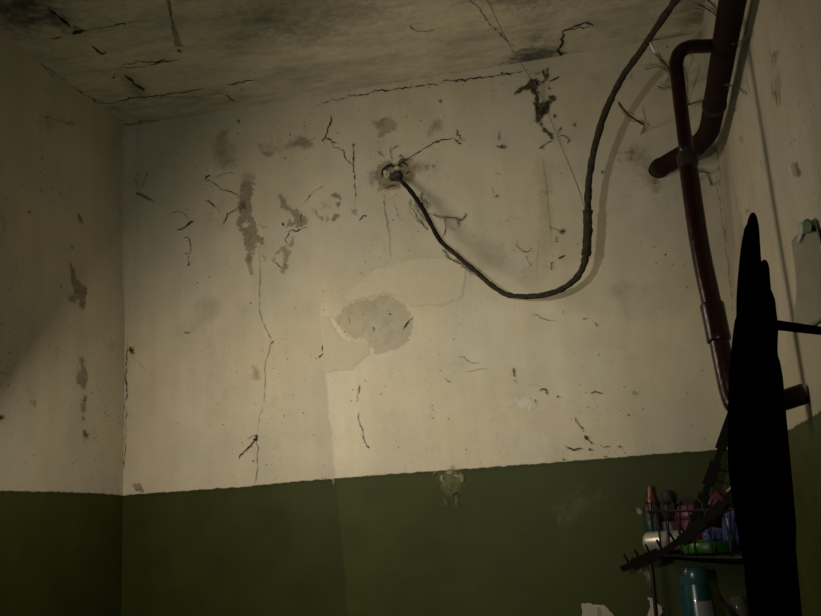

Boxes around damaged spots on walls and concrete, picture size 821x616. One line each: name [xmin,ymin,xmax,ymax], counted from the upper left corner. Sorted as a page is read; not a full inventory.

crack [48,9,137,55]
crack [557,22,594,56]
crack [25,50,253,104]
flaking render [514,68,570,149]
crack [317,69,529,197]
flaking render [375,146,415,189]
crack [173,211,194,266]
flaking render [70,263,87,308]
crack [238,255,282,484]
crack [565,417,609,457]
peeling [581,603,614,616]
peeling [647,597,663,616]